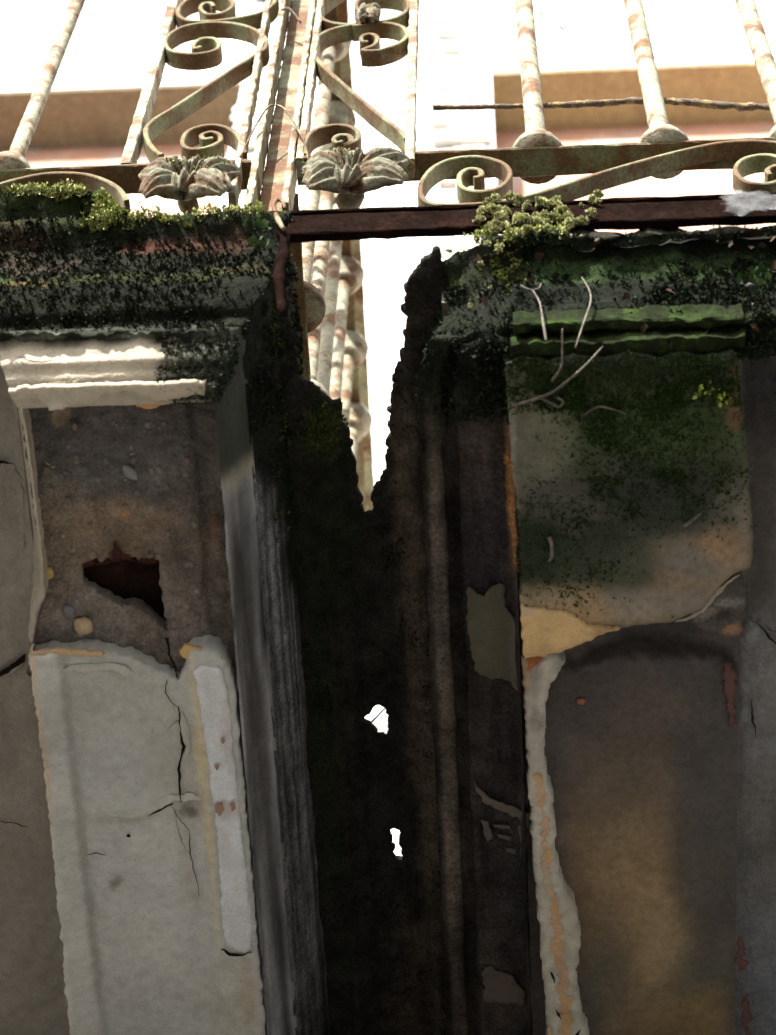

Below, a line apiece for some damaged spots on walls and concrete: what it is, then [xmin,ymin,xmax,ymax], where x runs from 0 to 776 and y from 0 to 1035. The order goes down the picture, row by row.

crack [0,654,26,680]
spalling [16,379,252,953]
crack [165,637,200,896]
flaking render [466,583,621,1035]